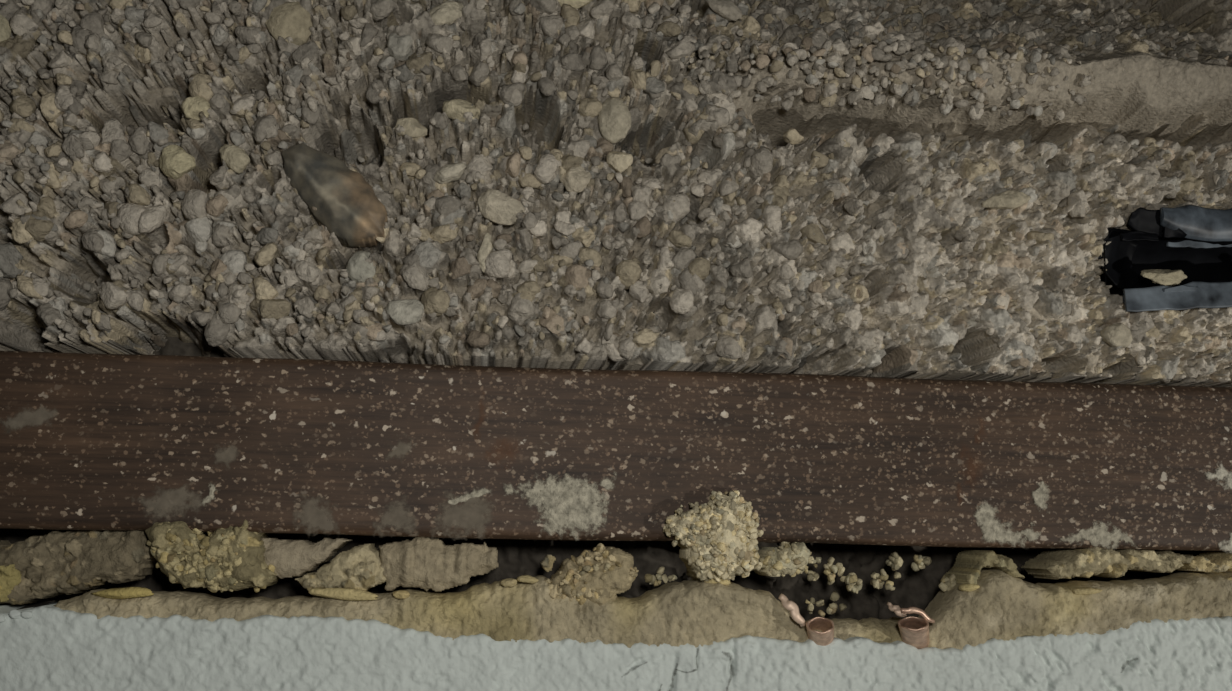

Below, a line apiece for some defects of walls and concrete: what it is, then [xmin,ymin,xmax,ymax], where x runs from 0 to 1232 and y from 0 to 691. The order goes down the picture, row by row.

water stain [435,474,617,539]
water stain [1206,464,1232,489]
peeling [53,575,903,648]
peeling [918,569,1232,650]